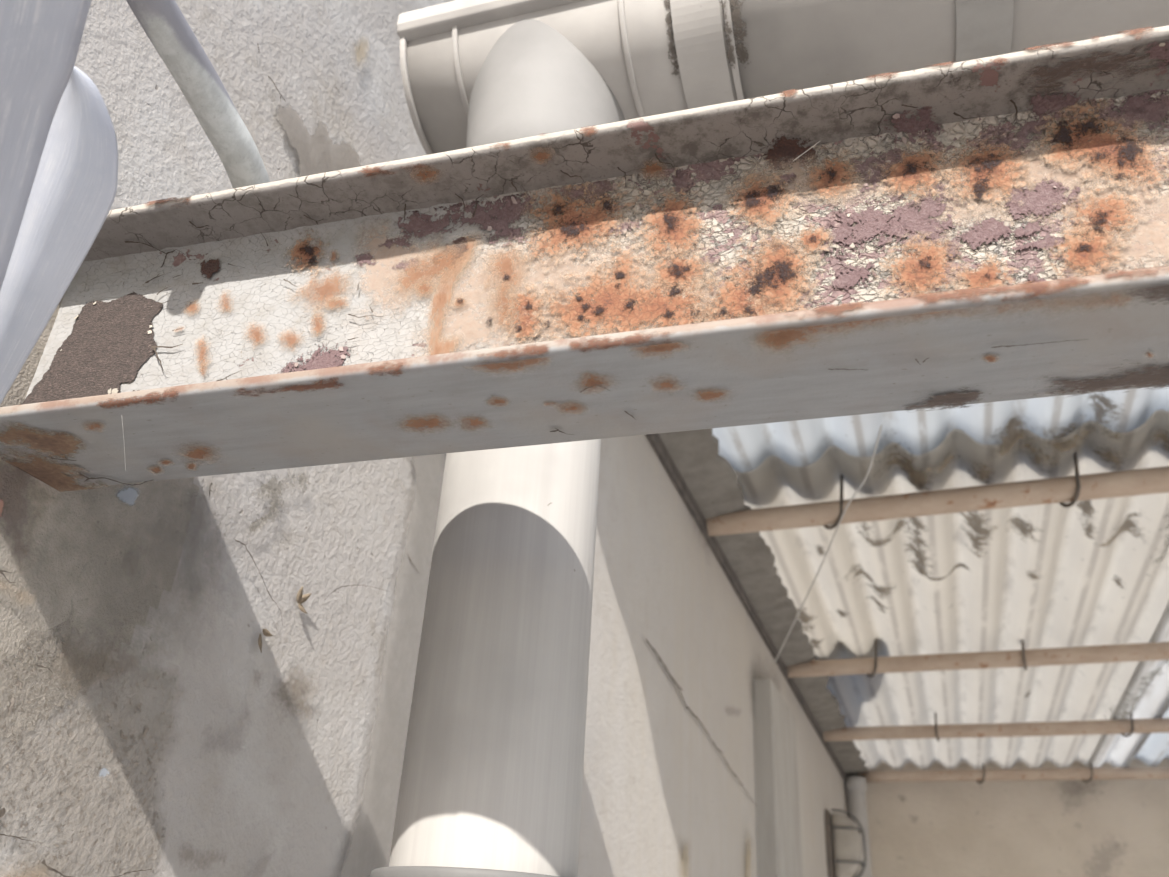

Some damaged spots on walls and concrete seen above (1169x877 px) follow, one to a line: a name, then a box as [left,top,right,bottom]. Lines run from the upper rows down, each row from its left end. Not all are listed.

peeling [818,107,1081,293]
corrosion [358,99,1169,373]
corrosion [200,259,220,279]
corrosion [284,229,347,335]
peeling [21,291,163,405]
corrosion [98,390,178,409]
corrosion [197,338,209,375]
corrosion [249,324,264,343]
corrosion [233,378,342,396]
corrosion [369,362,403,376]
corrosion [0,424,108,492]
leakage [249,472,309,532]